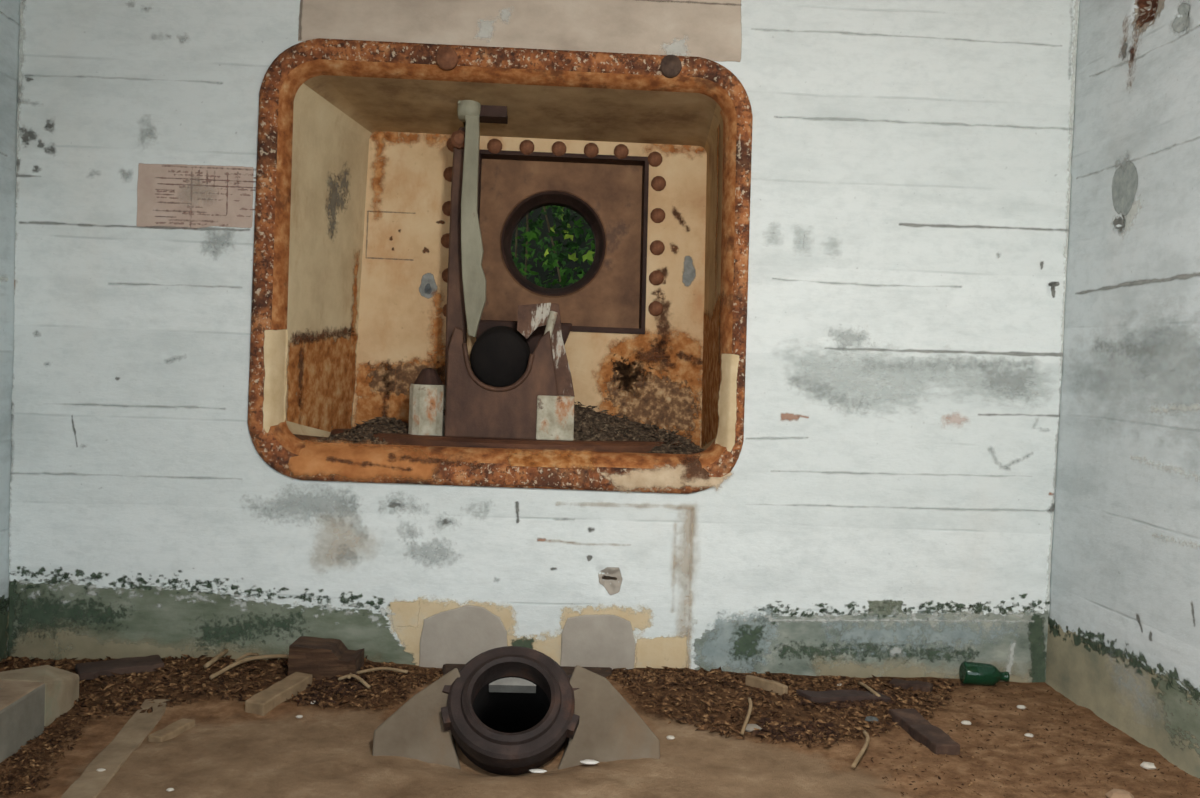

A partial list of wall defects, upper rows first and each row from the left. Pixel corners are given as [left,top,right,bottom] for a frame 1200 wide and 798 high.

spalling [1121,0,1190,86]
corrosion [287,252,481,480]
corrosion [372,131,449,219]
corrosion [595,126,721,446]
peeling [1048,1,1078,364]
spalling [1112,161,1141,232]
peeling [0,435,1200,778]